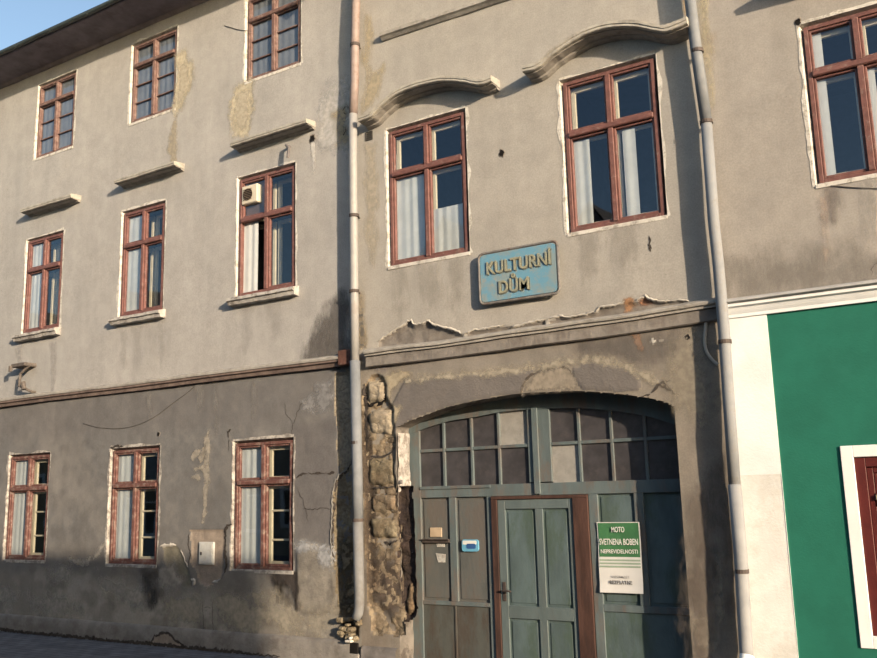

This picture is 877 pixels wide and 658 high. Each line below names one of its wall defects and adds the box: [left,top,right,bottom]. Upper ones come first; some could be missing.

peeling [168,50,193,161]
leakage [305,293,348,359]
flaking render [377,294,689,347]
flaking render [156,431,232,591]
crack [296,471,335,518]
flaking render [330,328,715,658]